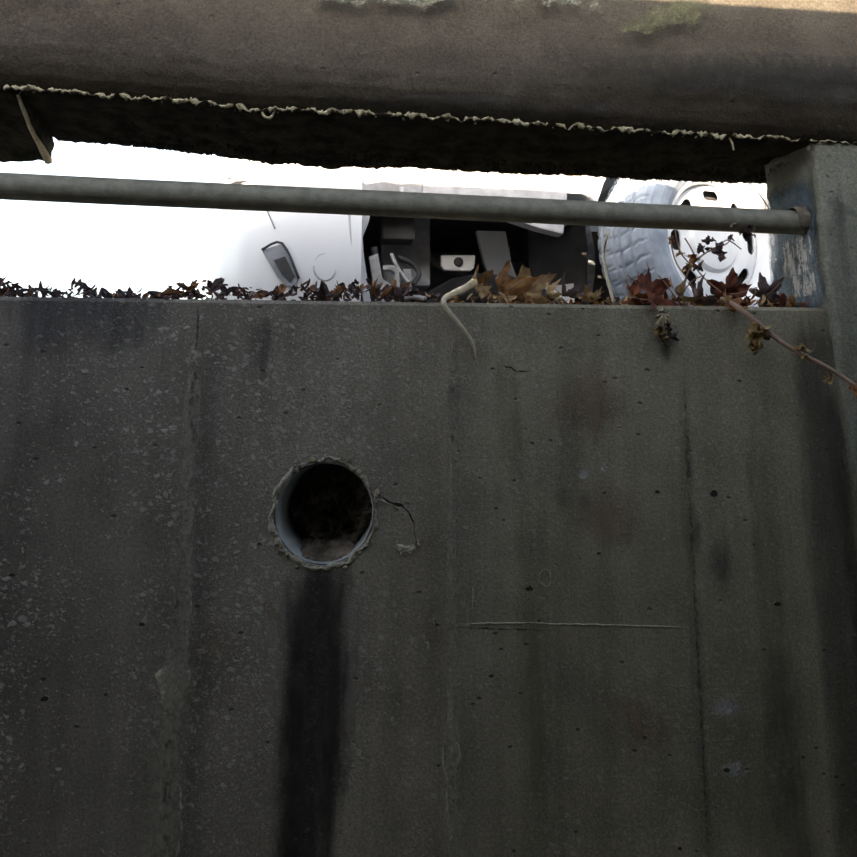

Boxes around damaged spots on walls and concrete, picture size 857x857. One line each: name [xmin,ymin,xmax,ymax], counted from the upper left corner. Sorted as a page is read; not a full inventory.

crack [376,494,417,542]
water stain [277,571,350,857]